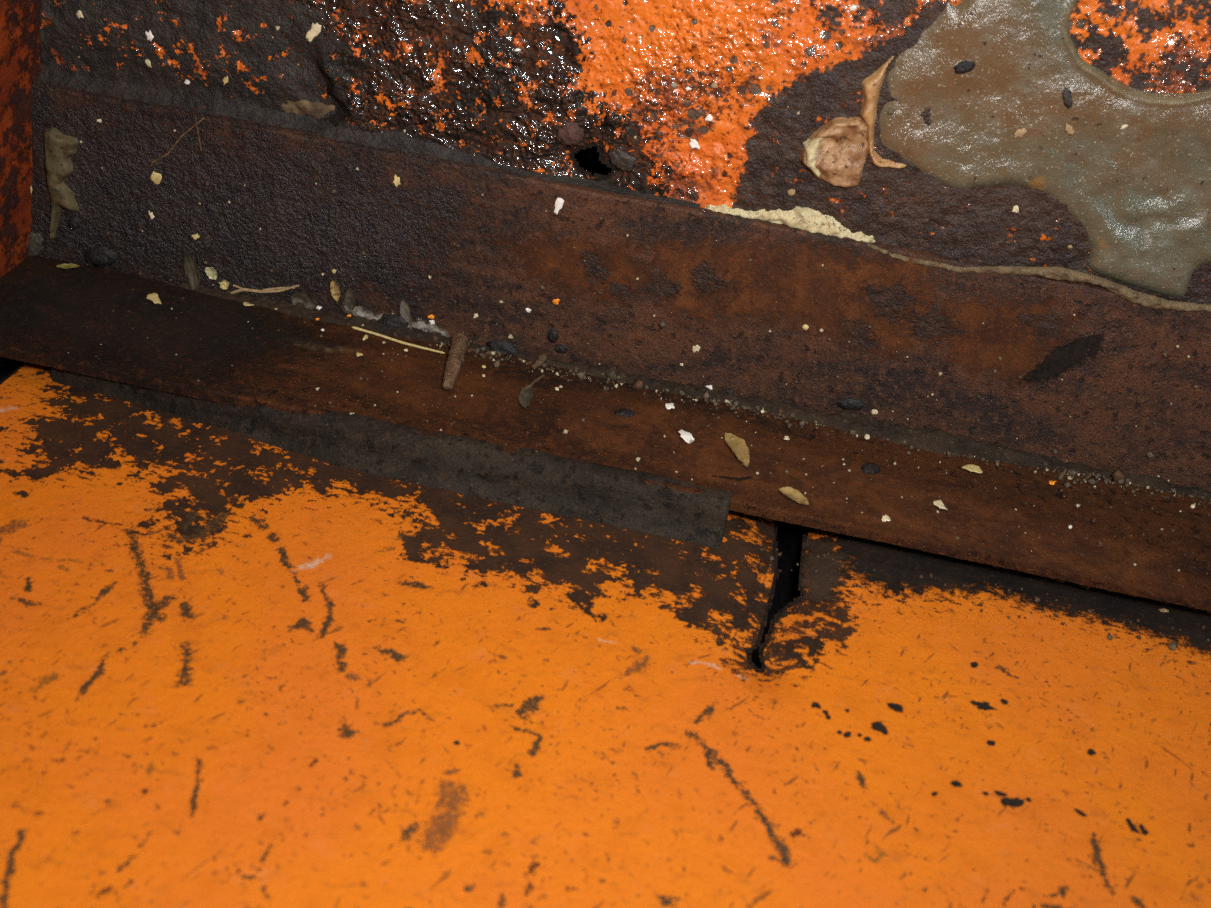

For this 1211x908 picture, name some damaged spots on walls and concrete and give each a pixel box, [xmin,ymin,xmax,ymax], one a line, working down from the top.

peeling [305,23,322,42]
corrosion [0,0,701,272]
spalling [569,142,620,180]
peeling [799,116,868,187]
corrosion [496,0,1211,389]
peeling [678,429,694,444]
corrosion [0,363,1211,699]